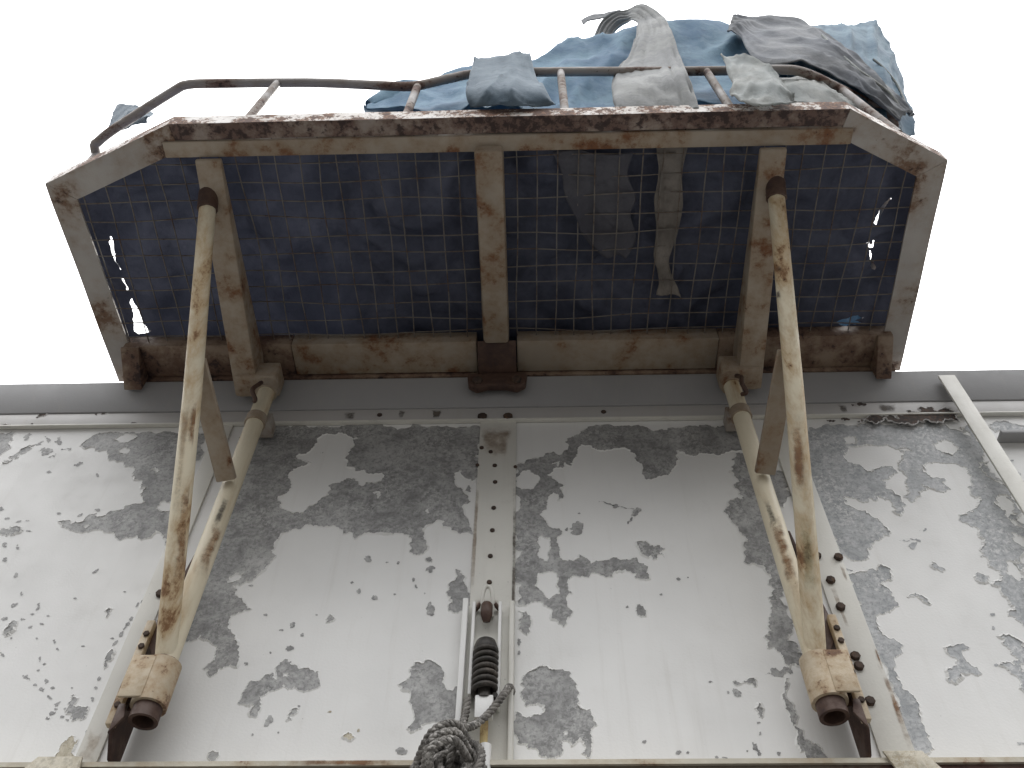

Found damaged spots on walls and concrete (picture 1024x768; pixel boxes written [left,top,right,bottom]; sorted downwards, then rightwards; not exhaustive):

peeling [0,413,178,545]
rust [794,432,803,481]
peeling [185,424,480,678]
peeling [514,424,829,759]
rust [775,530,792,575]
peeling [807,402,1024,756]
peeling [237,622,321,734]
peeling [397,658,457,734]